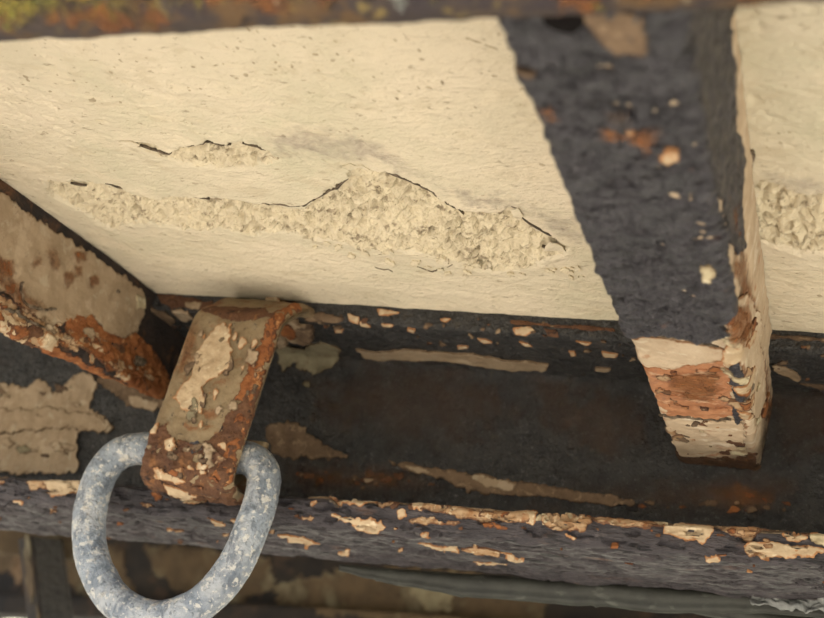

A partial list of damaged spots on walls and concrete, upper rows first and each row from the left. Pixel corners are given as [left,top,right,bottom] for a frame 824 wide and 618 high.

spalling [48,163,584,281]
peeling [498,7,824,461]
corrosion [0,252,171,400]
peeling [0,192,259,514]
corrosion [140,302,302,506]
peeling [356,324,549,373]
corrosion [642,361,733,421]
peeling [389,460,655,509]
peeling [66,561,89,597]
peeling [268,530,320,550]
peeling [229,556,547,618]
peeling [308,496,824,575]